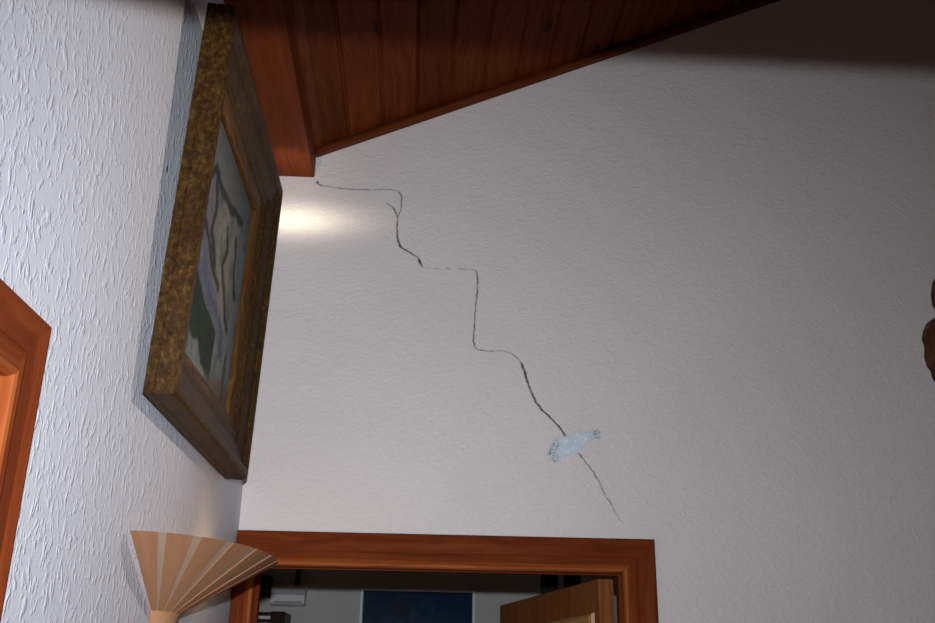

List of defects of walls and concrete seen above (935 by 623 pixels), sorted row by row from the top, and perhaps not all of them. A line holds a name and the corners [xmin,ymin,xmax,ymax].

crack [350,189,484,351]
crack [512,354,566,436]